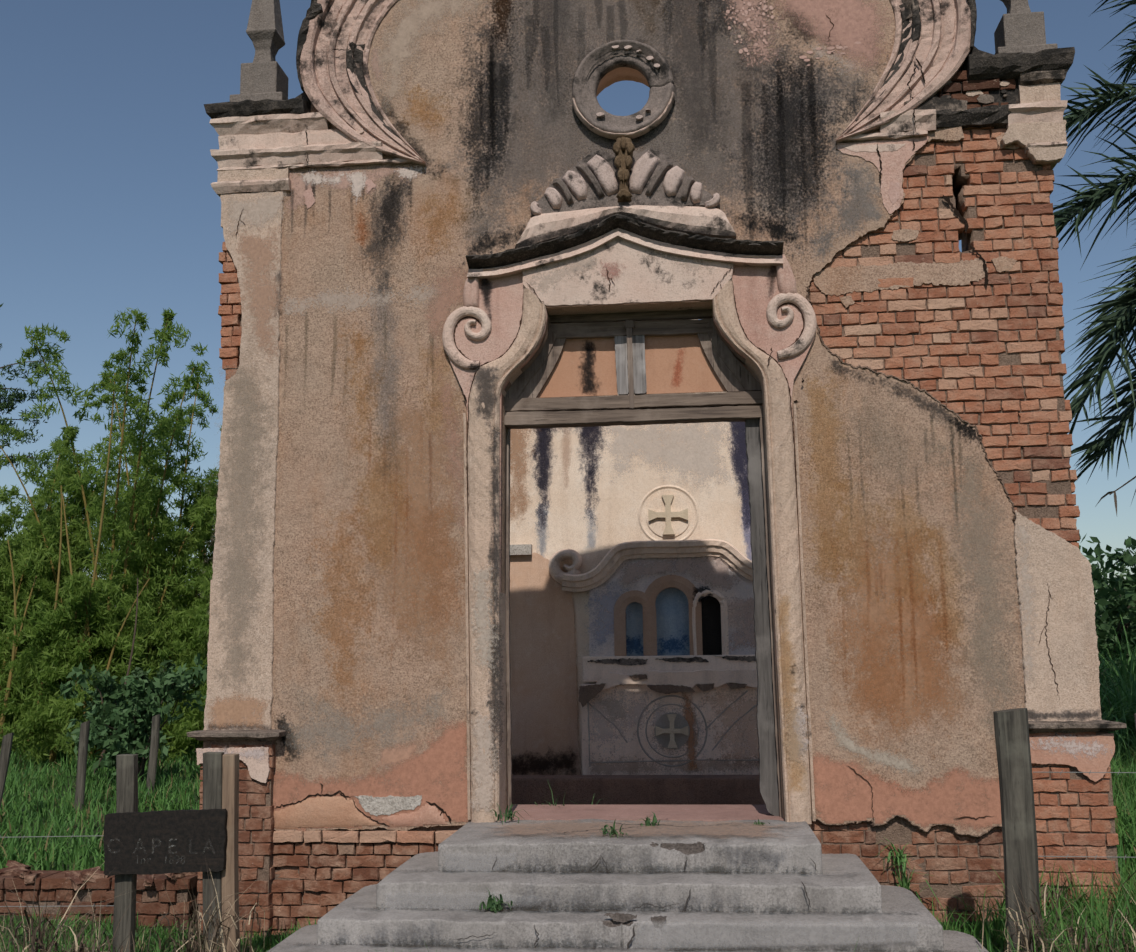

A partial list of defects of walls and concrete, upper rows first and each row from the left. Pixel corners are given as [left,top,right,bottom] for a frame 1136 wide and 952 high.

crack [943,195,989,290]
flaking render [218,242,242,380]
flaking render [806,127,1080,548]
damp [534,428,550,523]
damp [582,426,601,492]
crack [1039,579,1060,699]
peeling [1030,735,1107,758]
flaking render [355,795,422,816]
flaking render [271,830,457,935]